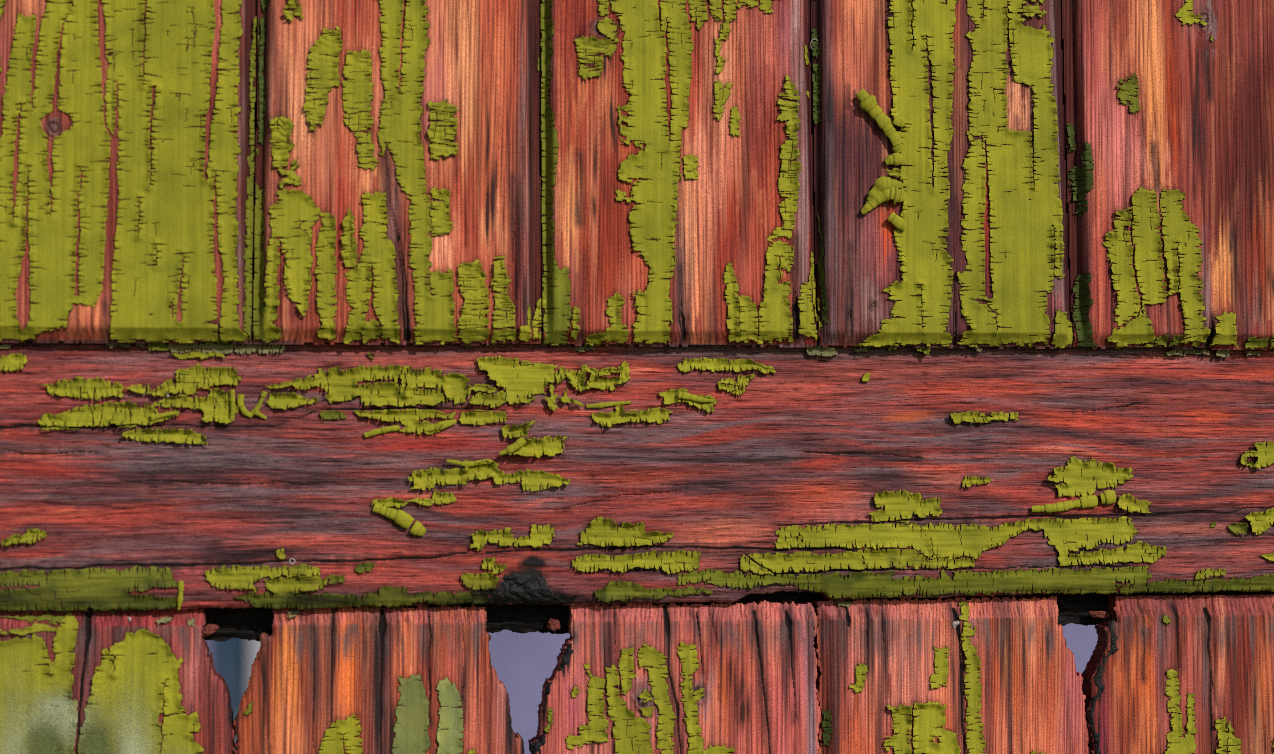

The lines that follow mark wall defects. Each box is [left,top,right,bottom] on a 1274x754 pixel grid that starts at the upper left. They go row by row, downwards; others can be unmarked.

peeling [724,29,838,356]
peeling [853,0,1274,357]
peeling [0,0,776,537]
peeling [950,411,1019,423]
peeling [1240,441,1274,468]
peeling [1,528,47,546]
peeling [205,524,555,619]
peeling [565,456,1274,754]
peeling [0,566,205,754]
peeling [319,713,364,754]
peeling [392,674,476,754]